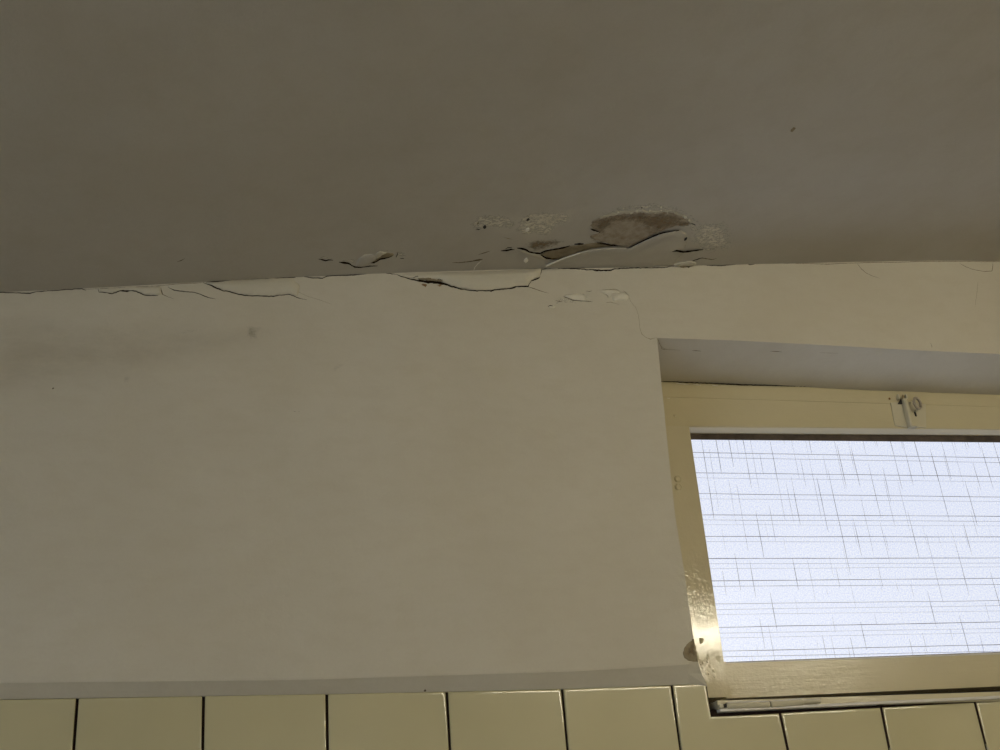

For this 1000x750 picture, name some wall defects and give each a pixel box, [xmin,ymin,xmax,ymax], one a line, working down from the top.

crack [0,274,363,304]
peeling [320,251,405,268]
crack [387,230,754,293]
spalling [517,204,695,263]